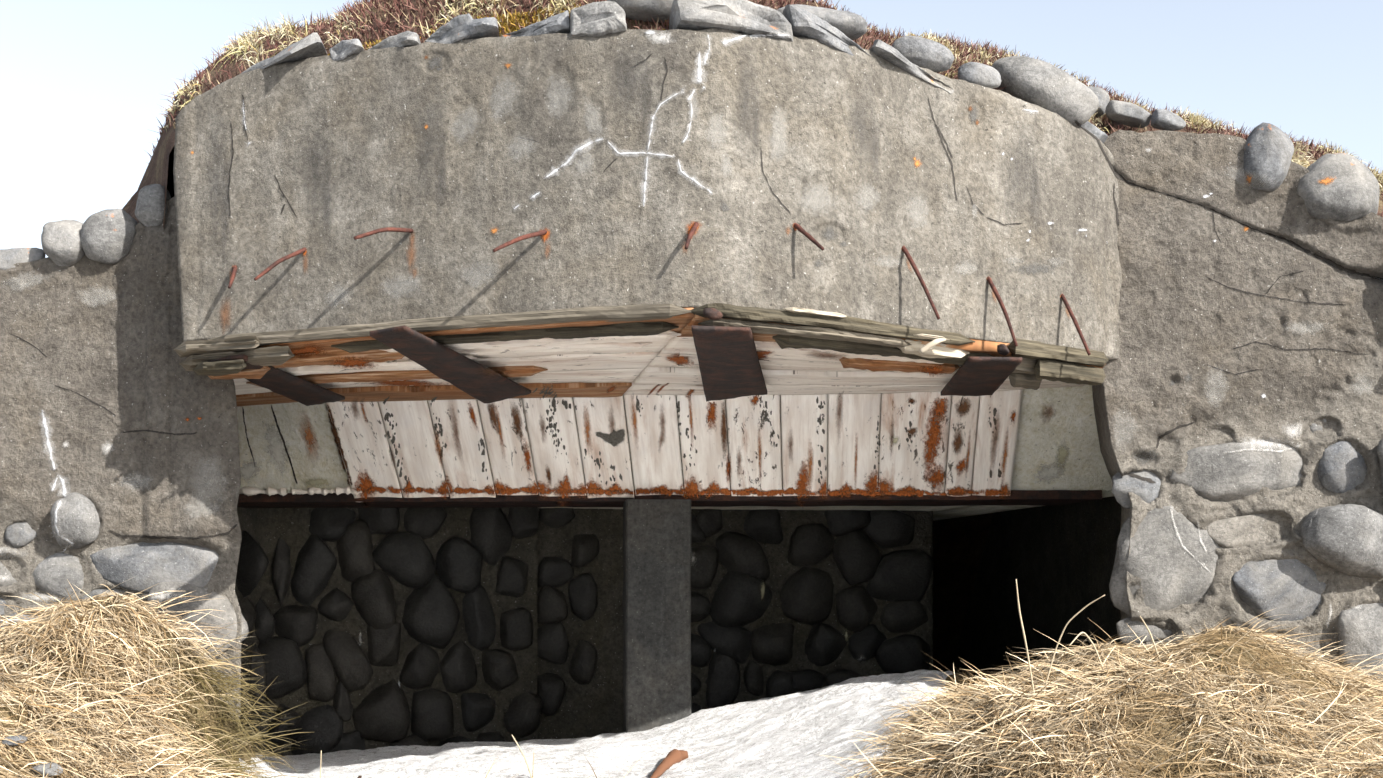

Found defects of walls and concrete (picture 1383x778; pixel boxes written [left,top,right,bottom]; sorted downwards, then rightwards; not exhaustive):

crack [928,98,1022,225]
crack [1075,121,1383,305]
rust [291,345,439,387]
rust [666,354,693,366]
rust [922,365,944,375]
crack [1208,341,1367,375]
peeling [533,386,577,455]
peeling [584,442,622,486]
rust [326,397,1010,506]
peeling [676,401,697,470]
peeling [816,397,827,484]
peeling [874,398,917,469]